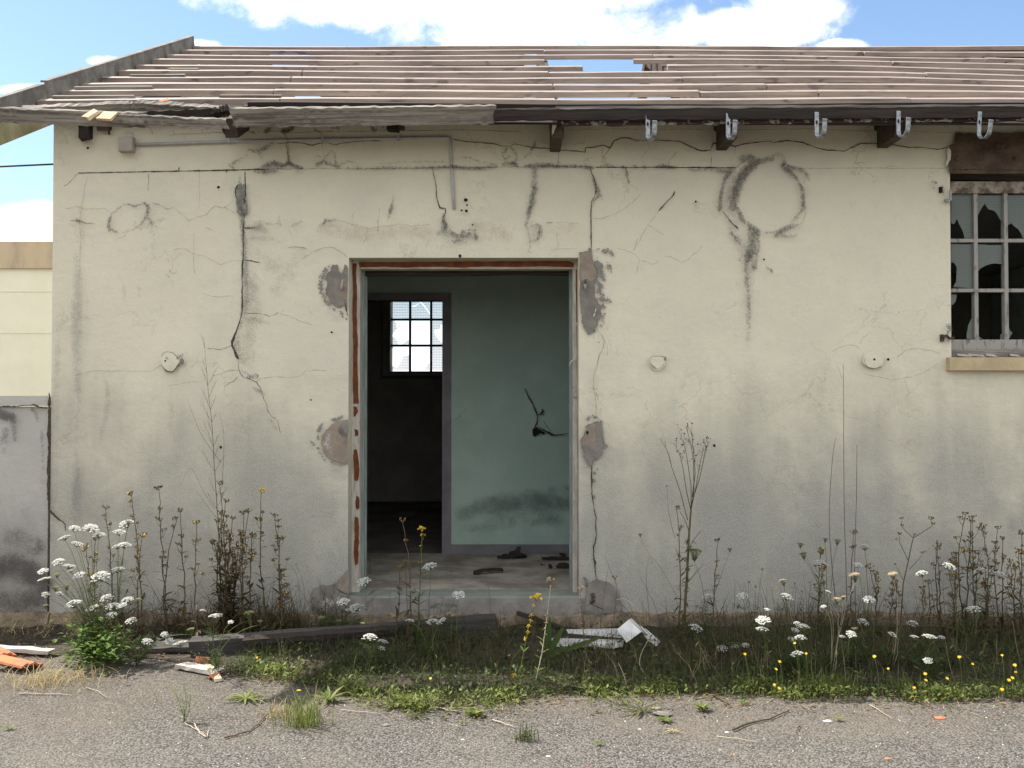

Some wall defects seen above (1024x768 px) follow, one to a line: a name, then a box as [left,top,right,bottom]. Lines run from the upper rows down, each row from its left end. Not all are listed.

crack [64,129,948,436]
water stain [689,154,808,315]
spalling [310,248,615,481]
water stain [0,410,17,441]
water stain [0,542,51,611]
crack [587,466,597,577]
spalling [577,415,608,531]
spalling [577,548,623,616]